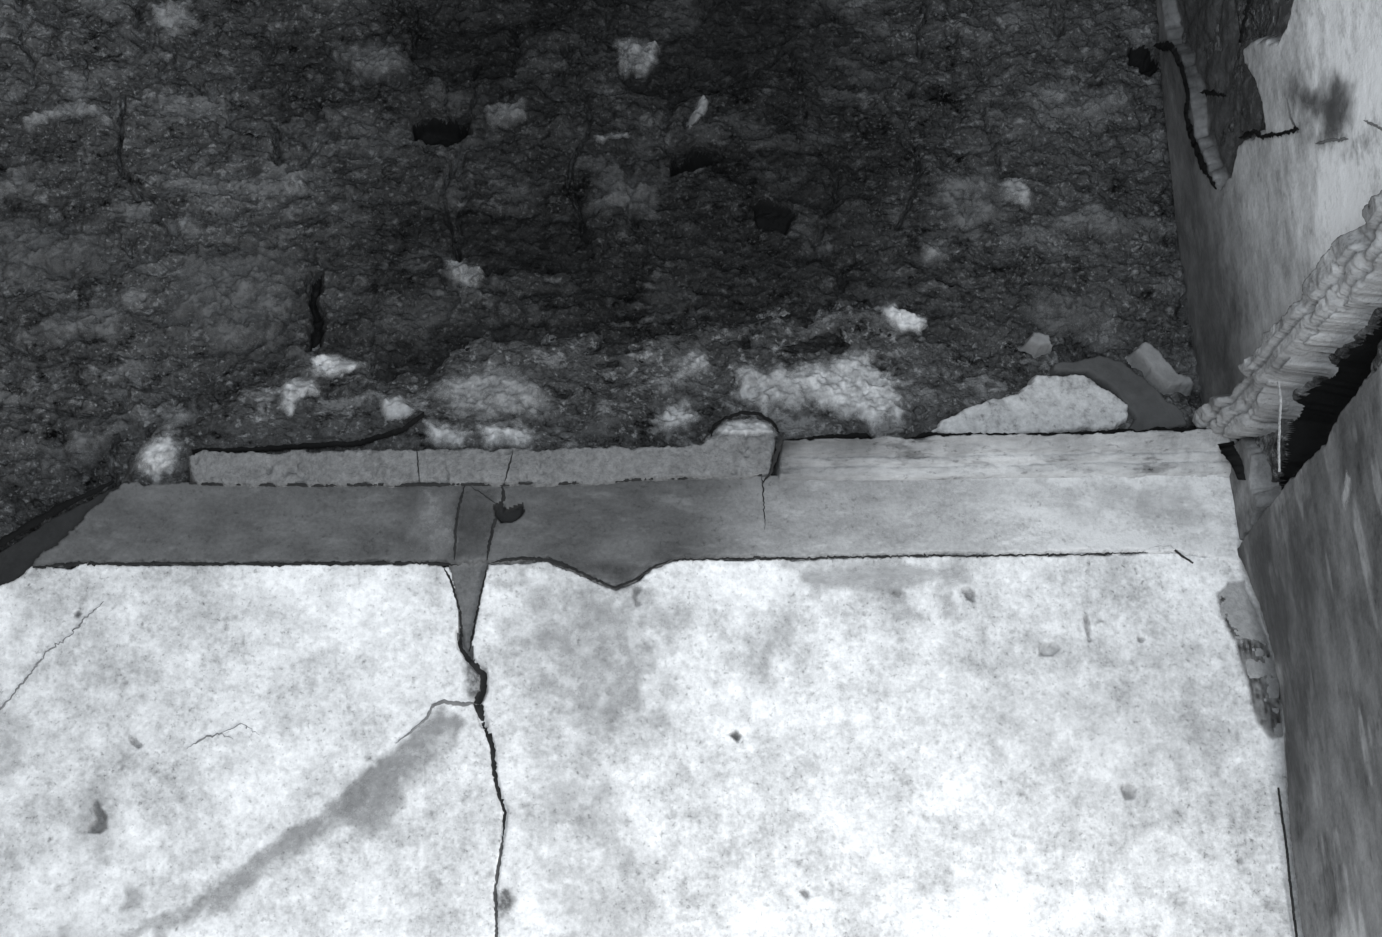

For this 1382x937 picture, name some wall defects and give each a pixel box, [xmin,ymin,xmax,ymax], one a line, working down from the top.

flaking render [1178,0,1294,177]
flaking render [0,0,1202,552]
crack [0,480,115,547]
crack [0,601,104,710]
crack [33,411,1246,937]
leakage [211,712,463,909]